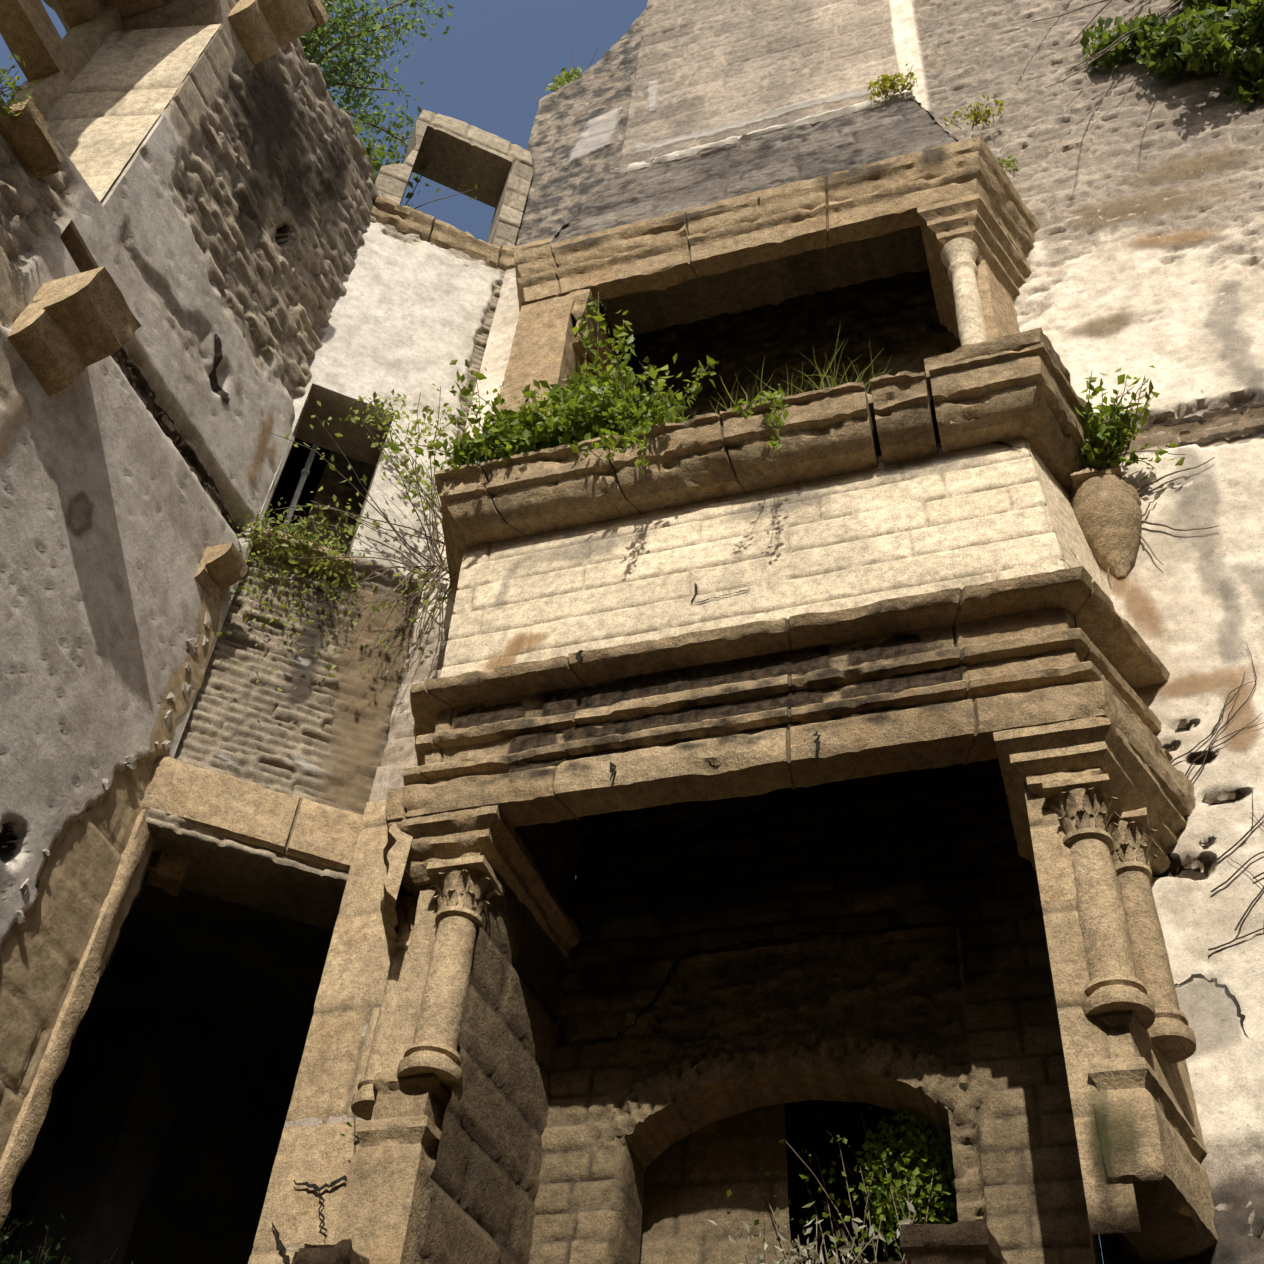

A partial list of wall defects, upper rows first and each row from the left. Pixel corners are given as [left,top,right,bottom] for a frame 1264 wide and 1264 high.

spalling [1162,718,1218,765]
spalling [1208,787,1252,805]
peeling [0,586,231,1160]
spalling [1153,836,1218,881]